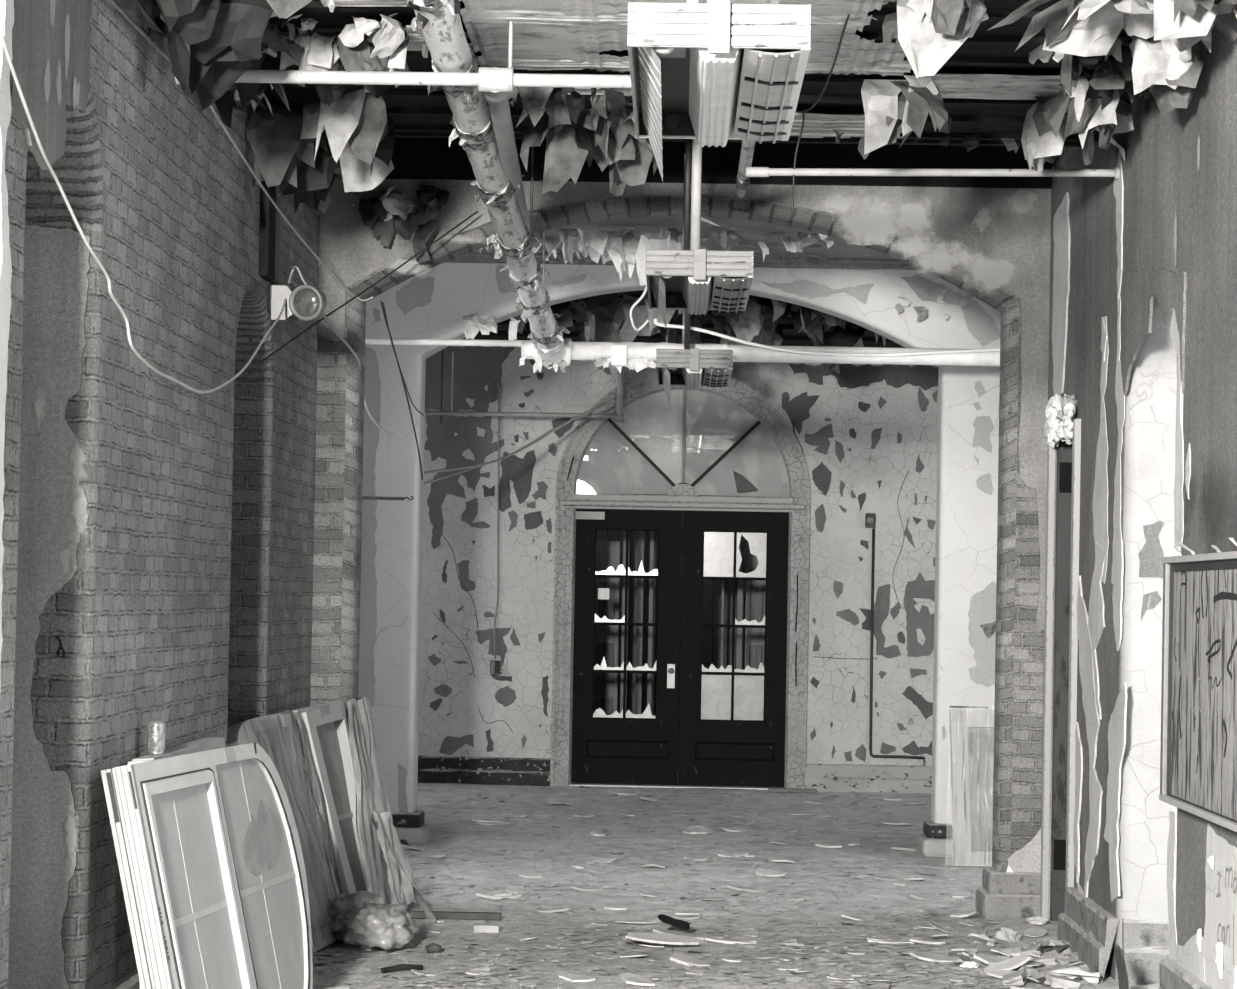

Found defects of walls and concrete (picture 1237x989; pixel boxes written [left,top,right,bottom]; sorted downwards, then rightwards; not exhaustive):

peeling [424,225,886,666]
peeling [782,363,938,533]
spalling [858,0,1237,902]
spalling [8,224,91,989]
peeling [430,684,452,716]
peeling [439,729,494,755]
peeling [476,611,520,707]
peeling [539,675,549,728]
peeling [833,494,936,719]
peeling [831,723,946,762]
peeling [1167,811,1237,989]